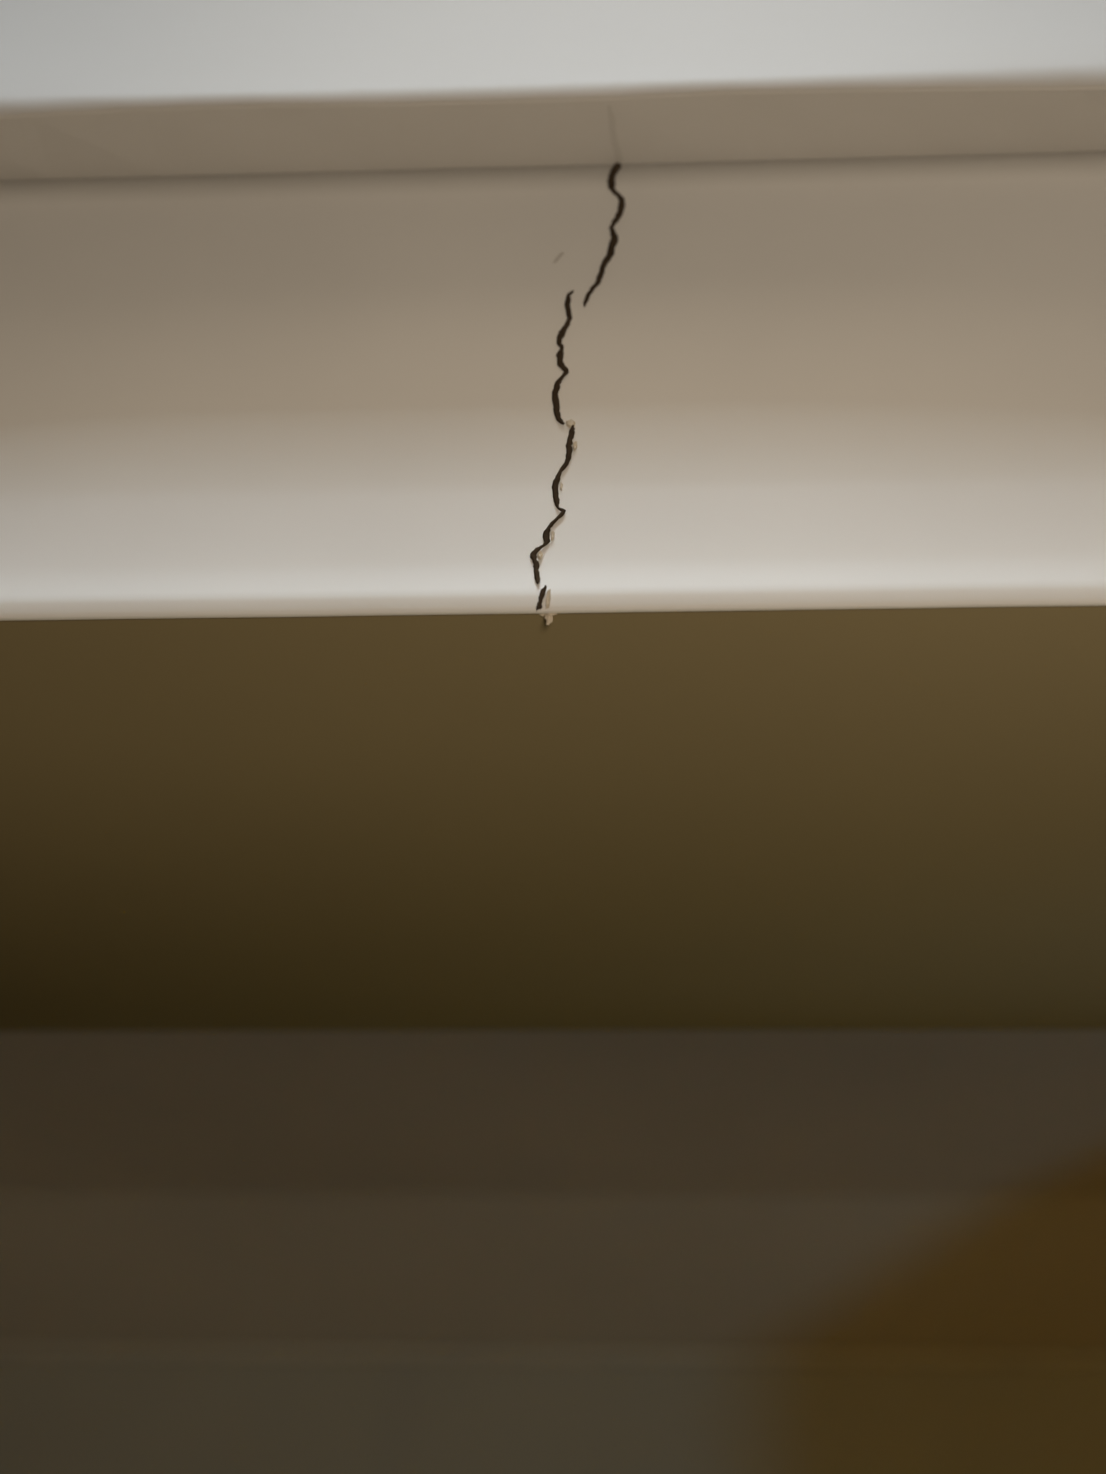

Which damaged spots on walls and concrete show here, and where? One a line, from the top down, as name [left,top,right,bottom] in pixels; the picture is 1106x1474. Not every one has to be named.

crack [530,163,625,611]